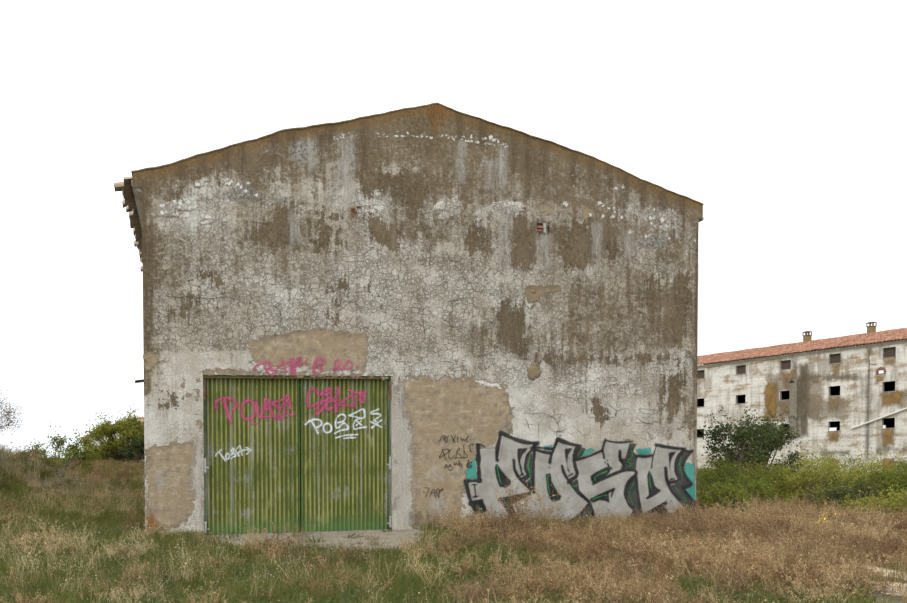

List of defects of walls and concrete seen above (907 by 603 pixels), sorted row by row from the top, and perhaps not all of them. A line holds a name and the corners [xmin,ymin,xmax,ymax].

crack [162,286,298,337]
crack [342,244,497,363]
spalling [143,352,160,370]
spalling [158,274,514,529]
crack [527,377,694,444]
water stain [793,361,857,435]
water stain [866,376,890,458]
spalling [141,413,203,534]